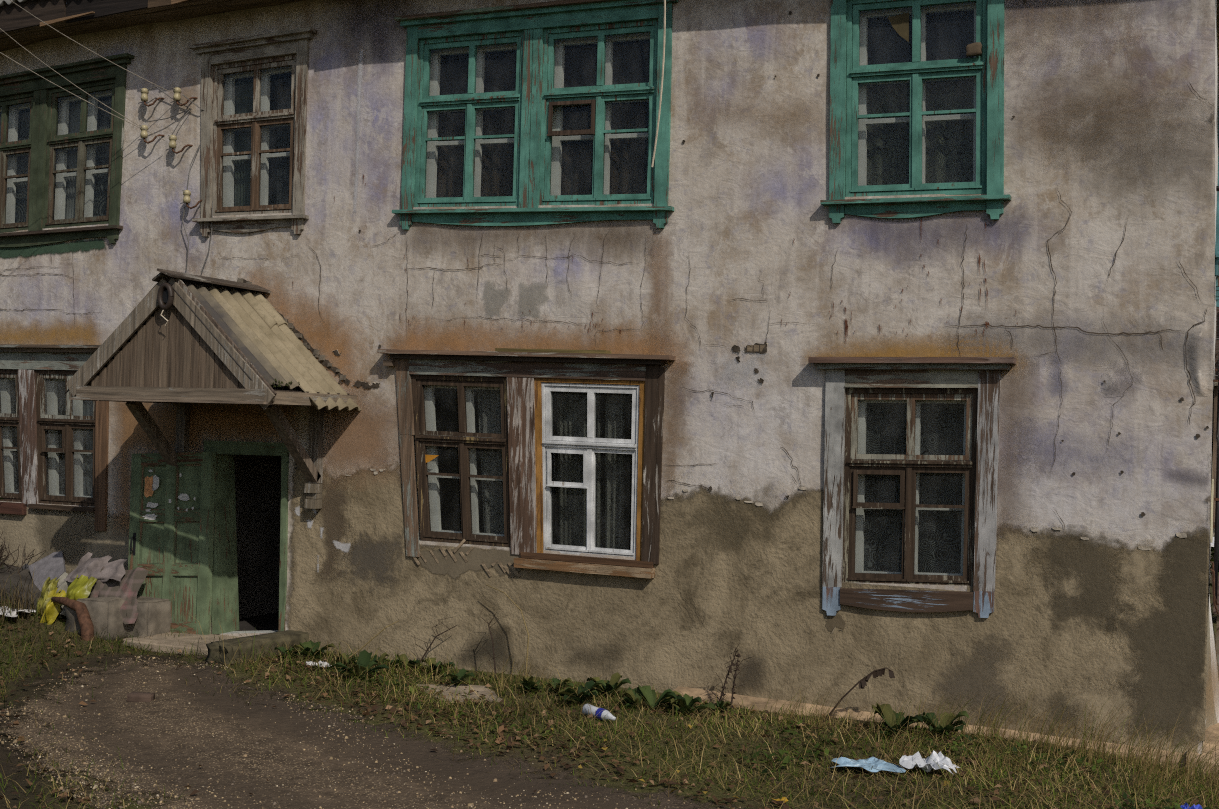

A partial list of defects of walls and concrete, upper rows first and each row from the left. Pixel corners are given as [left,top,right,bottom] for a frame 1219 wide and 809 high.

leakage [393,329,666,355]
crack [952,185,1207,467]
peeling [285,462,1217,754]
leakage [1045,532,1219,739]